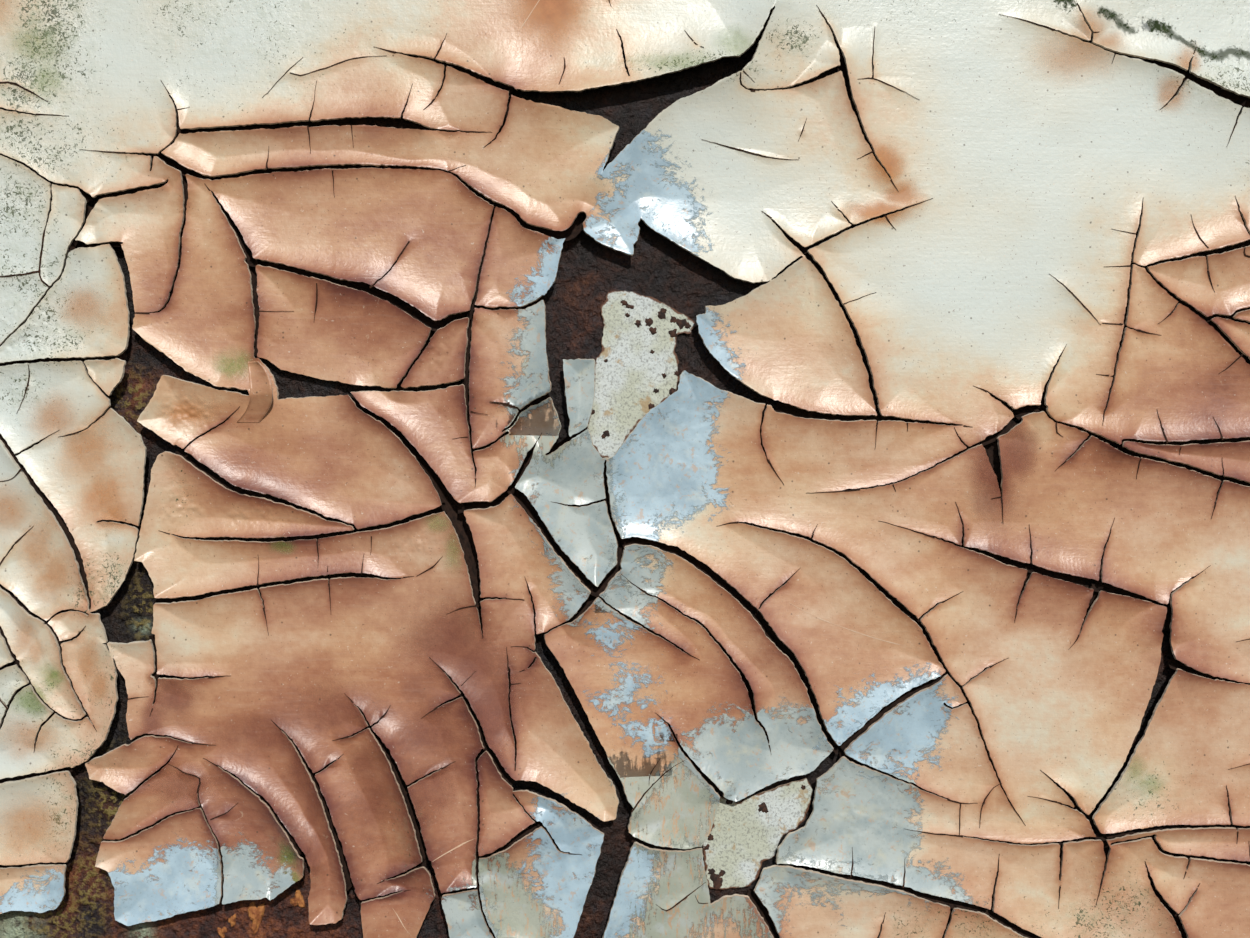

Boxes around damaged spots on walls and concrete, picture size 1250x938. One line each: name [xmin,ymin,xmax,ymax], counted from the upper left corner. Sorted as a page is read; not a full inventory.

crack [0,858,73,868]
crack [0,767,75,783]
crack [0,356,120,751]
crack [97,520,141,530]
crack [101,634,303,903]
crack [0,34,584,486]
peeling [0,7,985,938]
crack [609,0,630,76]
crack [153,395,1250,938]
crack [701,118,807,160]
crack [740,3,1250,685]
leakage [1097,8,1250,63]